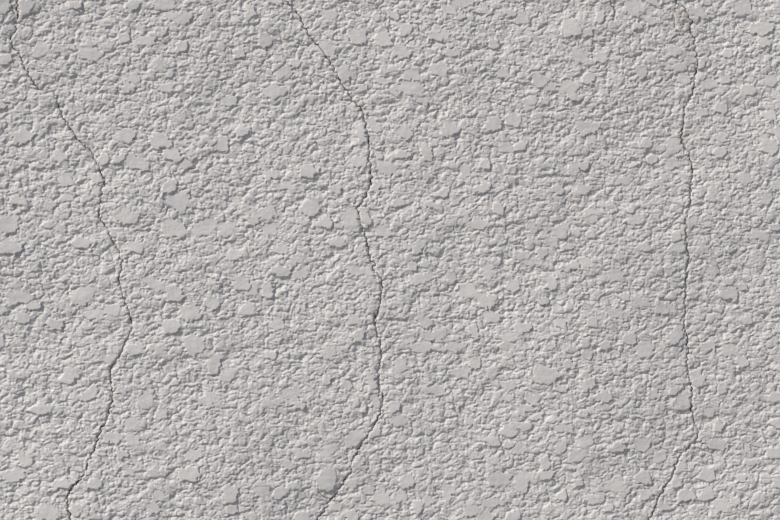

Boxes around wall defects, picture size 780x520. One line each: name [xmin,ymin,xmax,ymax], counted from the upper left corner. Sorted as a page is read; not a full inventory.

crack [10,0,133,520]
crack [285,0,384,520]
crack [648,1,709,520]